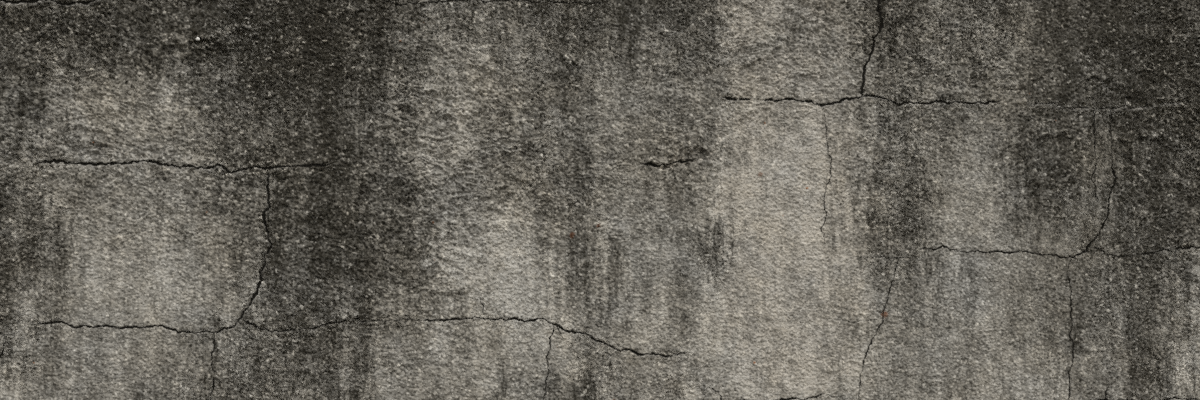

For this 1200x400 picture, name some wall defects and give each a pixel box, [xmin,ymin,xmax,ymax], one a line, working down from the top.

crack [0,159,686,400]
water stain [0,0,723,400]
crack [640,158,695,167]
water stain [698,220,733,277]
crack [723,0,999,244]
crack [780,102,1200,400]
water stain [856,0,1200,400]